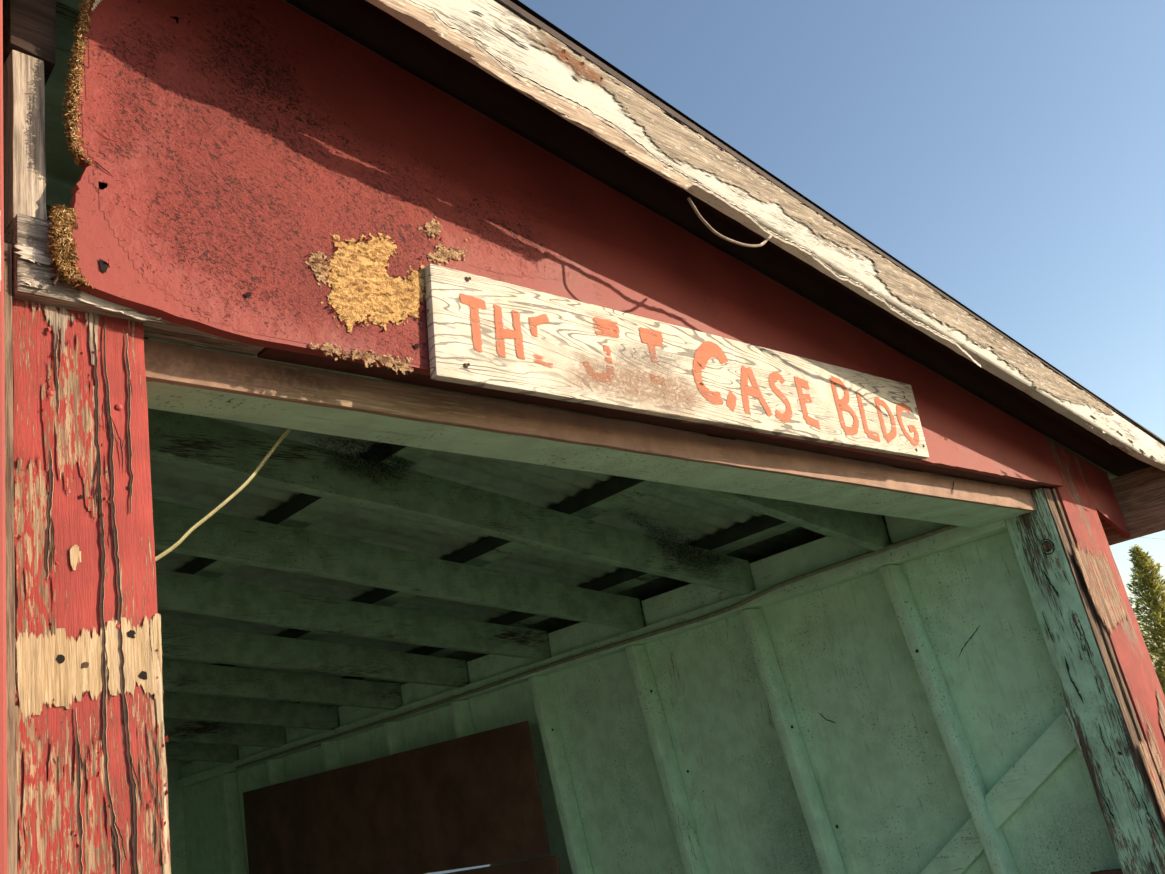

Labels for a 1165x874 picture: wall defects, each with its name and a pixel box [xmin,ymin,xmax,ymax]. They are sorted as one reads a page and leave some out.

spalling [304,216,471,332]
peeling [380,0,1165,466]
crack [53,332,61,415]
spalling [309,342,414,375]
crack [45,449,55,579]
peeling [14,204,163,874]
crack [74,313,141,874]
peeling [1035,515,1129,635]
peeling [1068,607,1126,729]
peeling [139,721,170,864]
peeling [1094,722,1165,874]